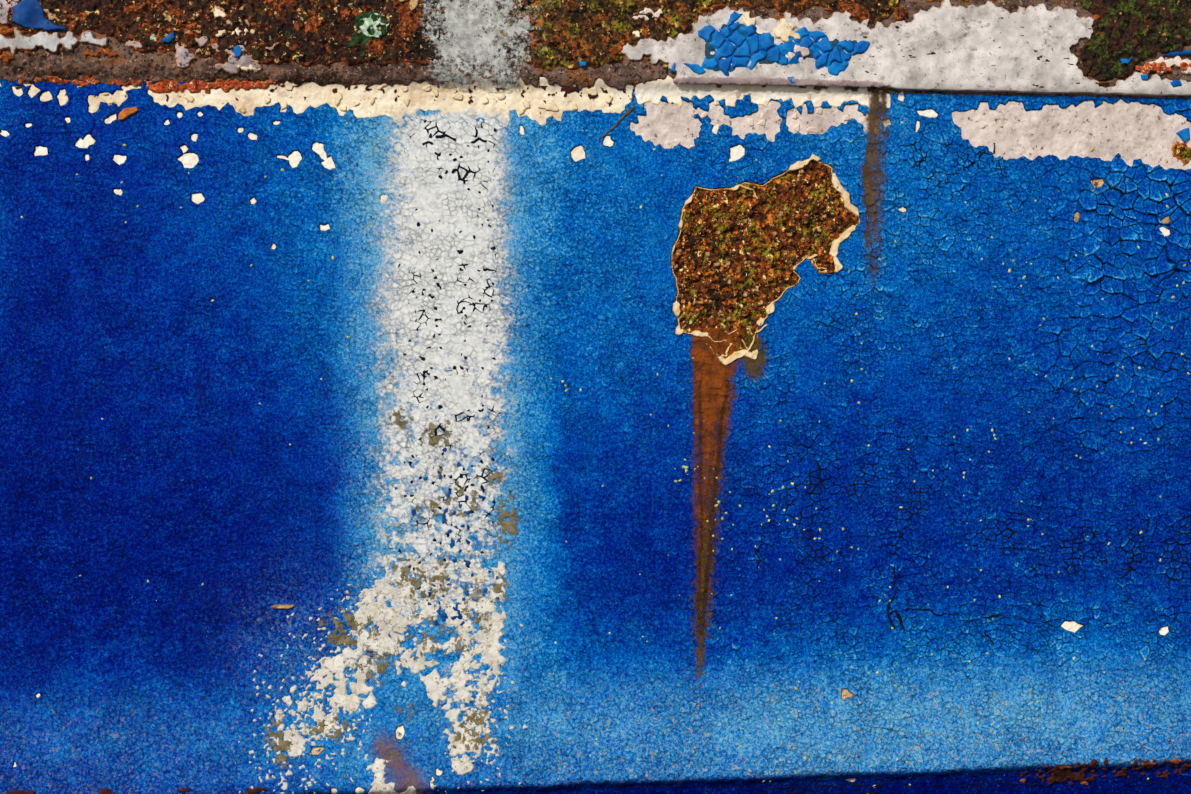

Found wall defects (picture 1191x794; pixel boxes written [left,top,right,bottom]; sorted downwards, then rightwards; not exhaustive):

rust [0,0,454,87]
peeling [0,0,1191,170]
peeling [192,193,204,204]
crack [898,130,1016,238]
crack [397,119,500,572]
rust [671,91,889,689]
crack [1032,170,1191,469]
peeling [275,471,507,794]
crack [733,435,880,584]
crack [885,464,1191,647]
rust [1020,757,1191,786]